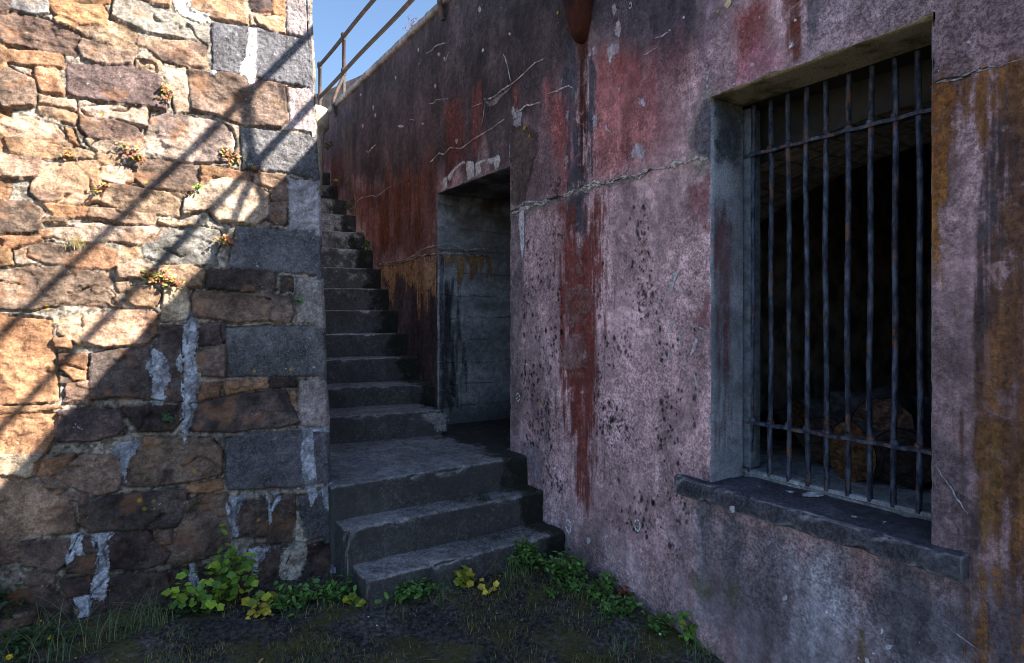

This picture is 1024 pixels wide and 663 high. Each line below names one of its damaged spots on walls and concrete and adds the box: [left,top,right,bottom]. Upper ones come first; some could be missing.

rust [379,178,492,321]
crack [430,55,573,162]
water stain [510,4,651,258]
crack [510,156,708,214]
crack [930,58,1023,88]
water stain [145,312,200,445]
water stain [439,257,468,410]
rust [549,195,607,515]
rust [932,55,1024,663]
water stain [65,531,115,618]
water stain [226,426,331,581]